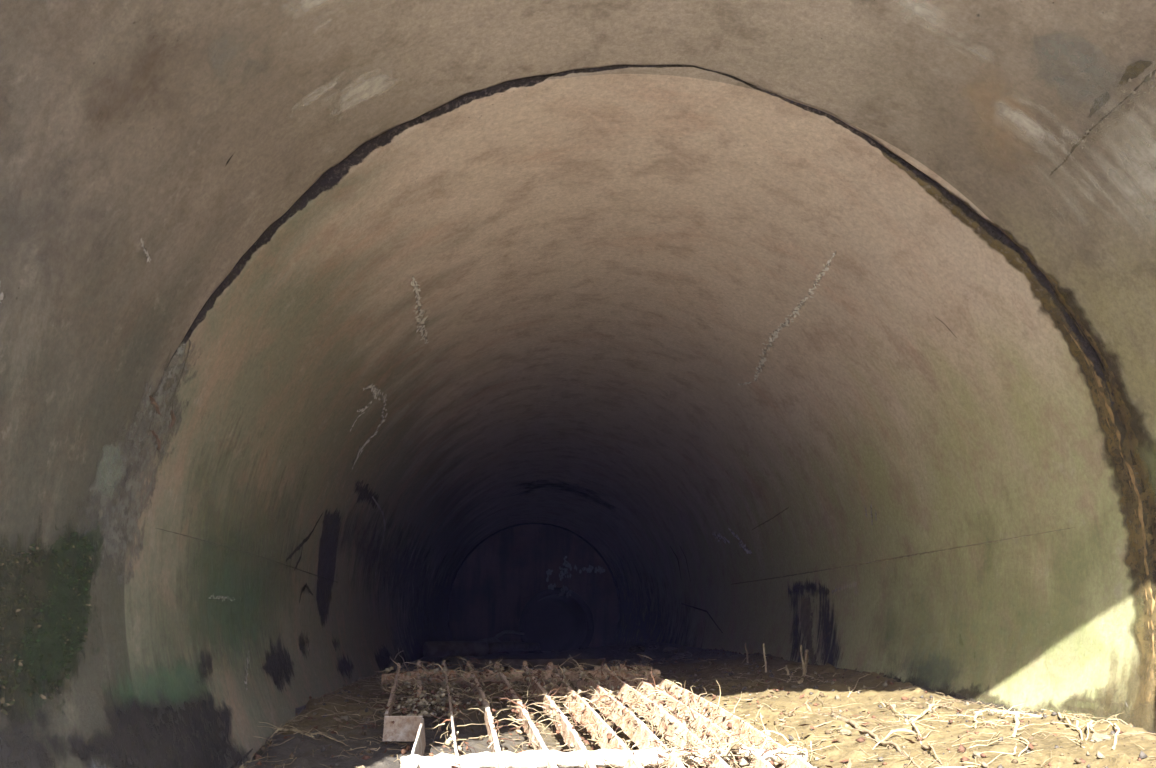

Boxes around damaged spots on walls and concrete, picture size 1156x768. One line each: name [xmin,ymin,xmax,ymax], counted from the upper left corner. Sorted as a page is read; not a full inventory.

crack [1050,54,1156,176]
leakage [0,651,253,768]